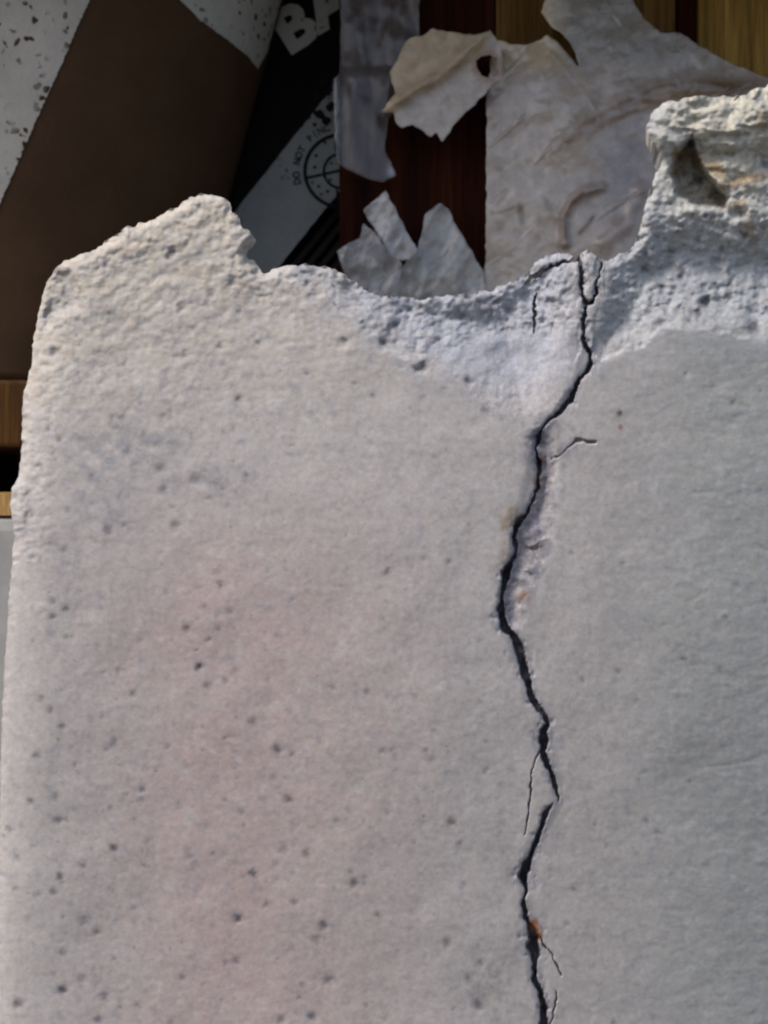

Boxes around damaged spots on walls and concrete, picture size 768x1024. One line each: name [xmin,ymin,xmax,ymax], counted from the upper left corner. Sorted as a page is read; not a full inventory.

crack [497,254,603,1024]